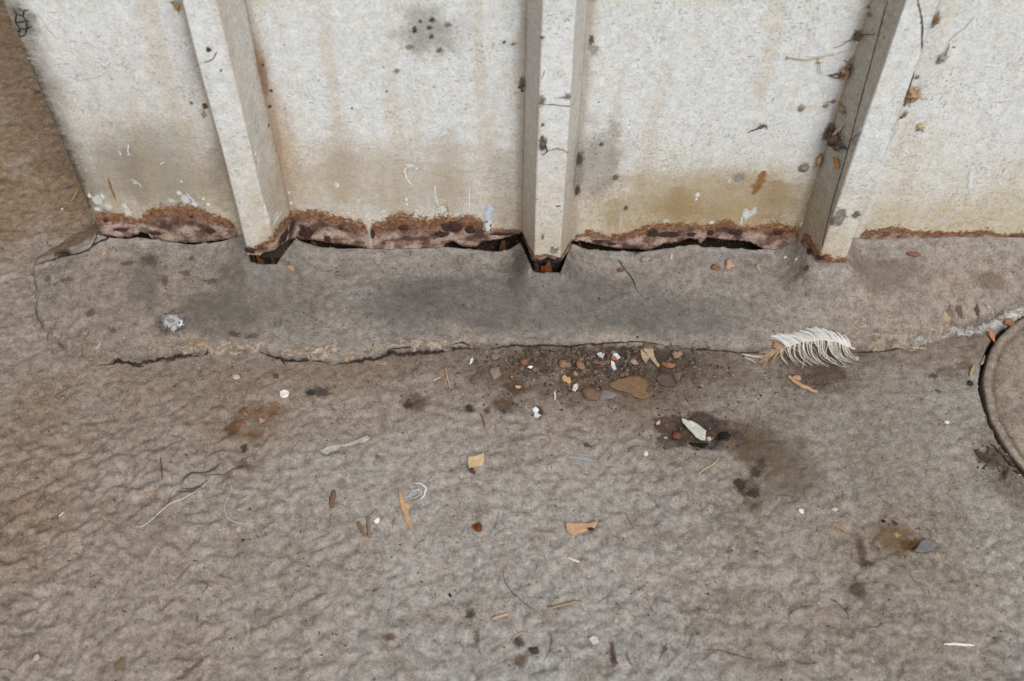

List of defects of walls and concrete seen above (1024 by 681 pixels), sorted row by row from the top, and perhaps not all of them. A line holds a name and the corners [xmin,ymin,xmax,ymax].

corrosion [95,178,238,243]
corrosion [244,209,847,263]
corrosion [859,224,1024,240]
crack [97,350,208,367]
crack [260,341,758,365]